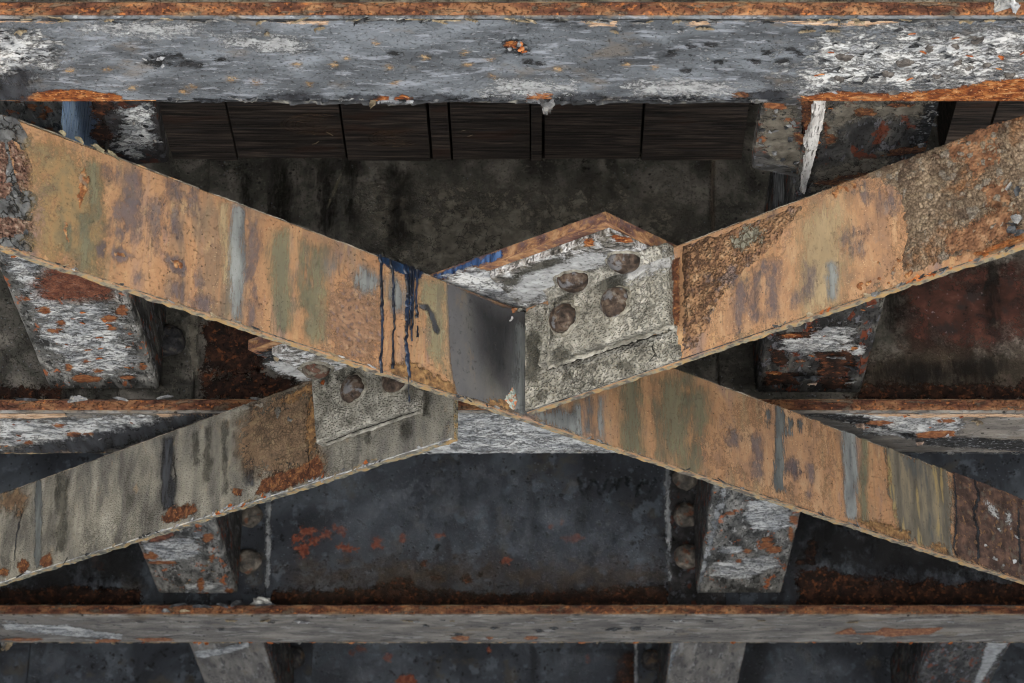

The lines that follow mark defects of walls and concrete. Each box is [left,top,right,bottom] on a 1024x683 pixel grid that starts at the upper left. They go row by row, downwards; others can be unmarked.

peeling [0,0,1024,221]
rust [671,115,1024,399]
peeling [1006,214,1024,237]
rust [20,267,130,334]
rust [97,165,327,495]
rust [318,276,457,394]
rust [0,381,62,399]
rust [143,502,197,565]
rust [694,395,844,563]
rust [984,500,1012,525]
rust [0,552,144,605]
rust [793,538,1024,605]